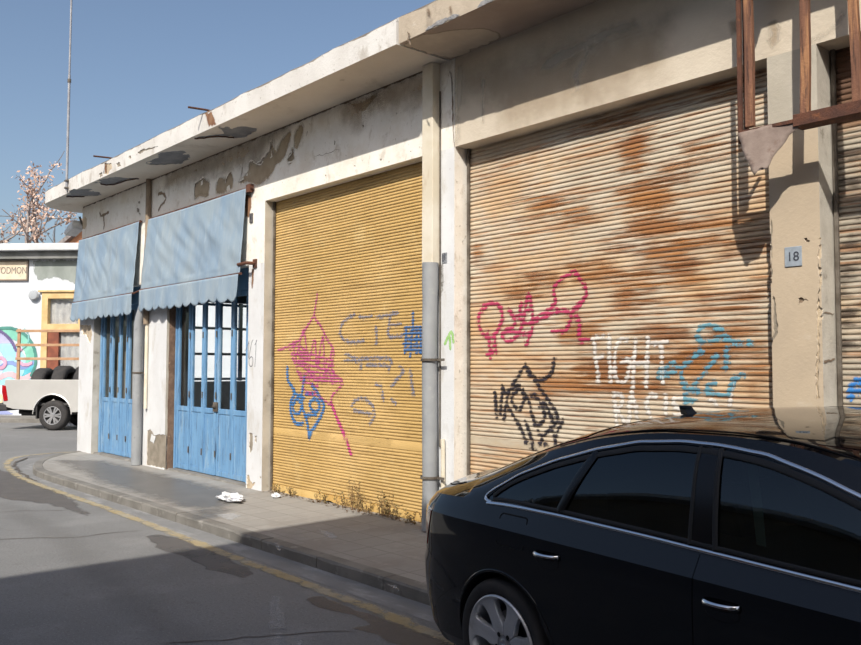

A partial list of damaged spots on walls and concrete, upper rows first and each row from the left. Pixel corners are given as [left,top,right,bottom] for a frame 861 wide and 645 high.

rust [835,47,852,105]
flaking render [194,126,308,198]
rust [590,113,650,170]
rust [507,135,770,316]
rust [537,320,772,395]
flaking render [147,429,166,468]